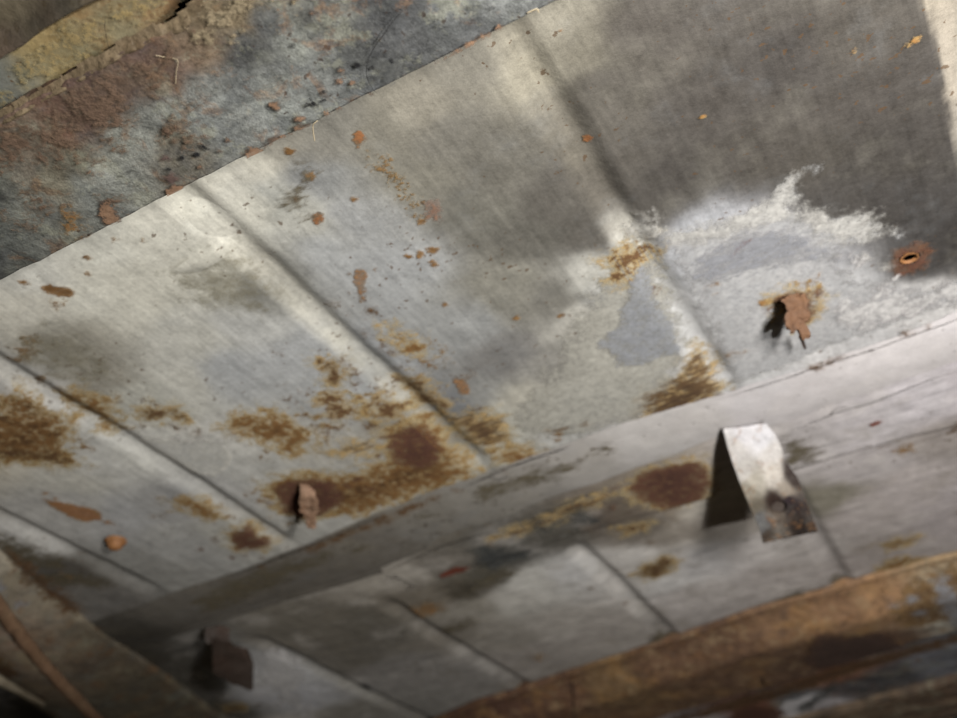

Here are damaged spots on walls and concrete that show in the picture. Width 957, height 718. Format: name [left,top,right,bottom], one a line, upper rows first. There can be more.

rust [349,269,378,313]
rust [405,247,439,267]
rust [597,240,662,288]
damp [515,174,957,440]
rust [758,279,827,325]
rust [640,342,745,418]
rust [0,376,200,467]
rust [218,321,569,554]
rust [166,494,281,559]
rust [486,455,719,548]
rust [628,554,681,583]
damp [802,633,905,669]